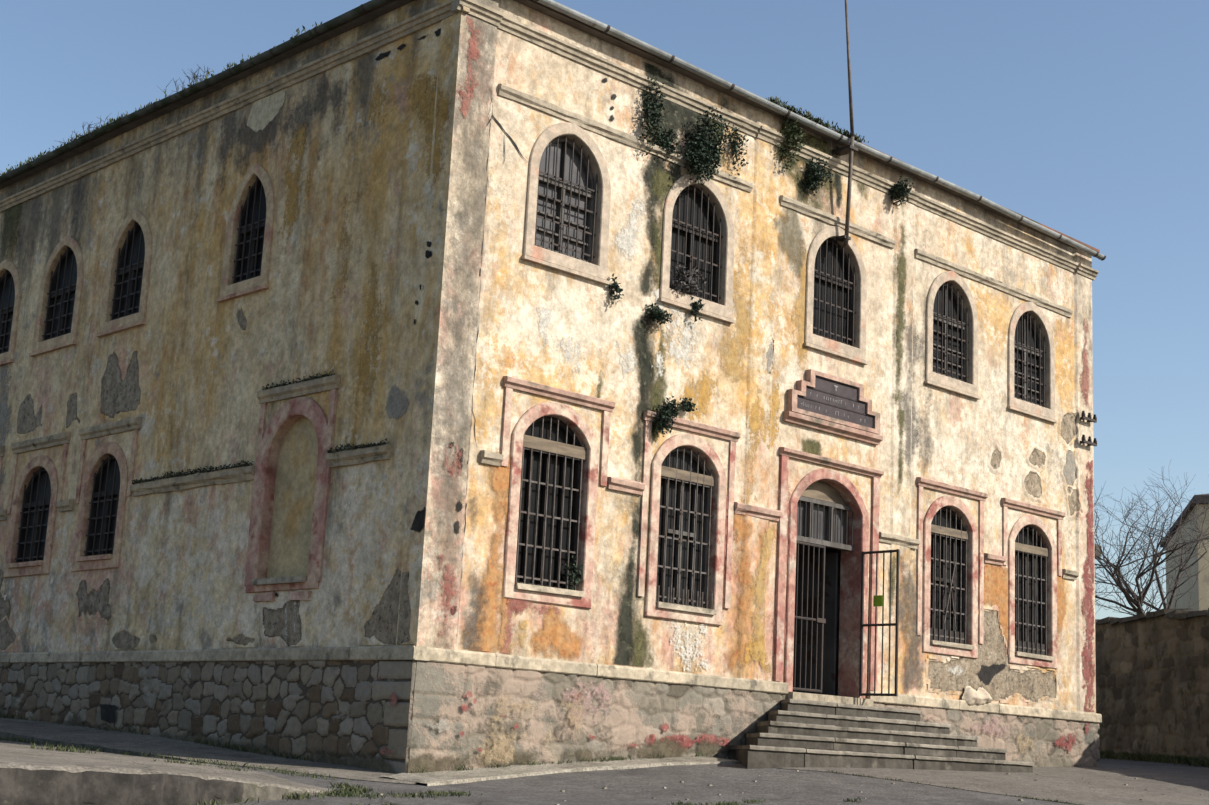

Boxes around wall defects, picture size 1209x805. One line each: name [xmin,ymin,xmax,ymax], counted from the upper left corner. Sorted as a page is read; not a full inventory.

crack [479,92,525,299]
water stain [641,103,682,296]
spalling [99,345,147,422]
crack [457,329,479,633]
water stain [633,313,667,477]
water stain [681,240,755,422]
water stain [894,227,930,492]
spalling [1021,408,1084,522]
spalling [220,590,307,648]
spalling [357,556,417,645]
water stain [615,499,652,668]
spalling [924,605,1059,706]